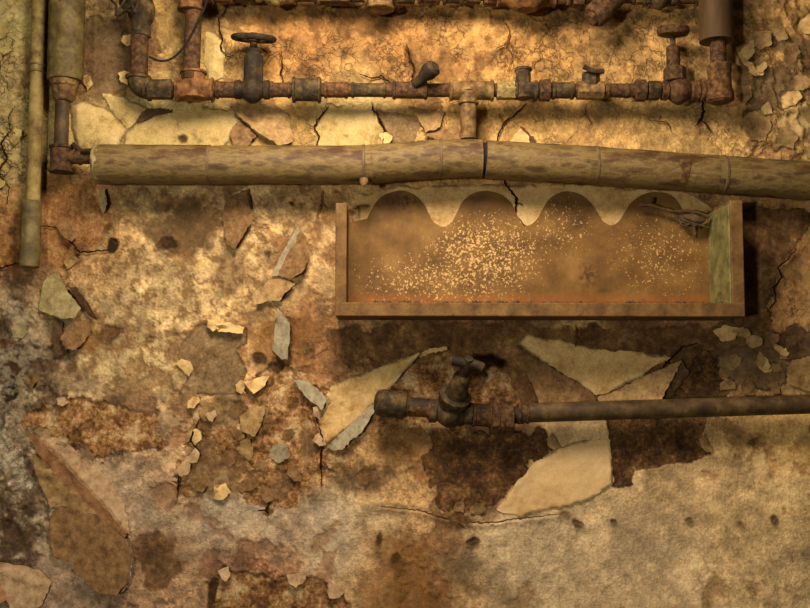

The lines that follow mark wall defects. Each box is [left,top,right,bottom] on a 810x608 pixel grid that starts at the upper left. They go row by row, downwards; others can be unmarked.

peeling [798,13,810,34]
peeling [735,20,810,149]
crack [0,106,16,204]
crack [766,249,796,312]
peeling [0,323,28,348]
peeling [1,360,40,402]
flaking render [172,226,560,523]
flaking render [21,395,182,596]
peeling [0,562,52,608]
flaking render [205,566,351,608]